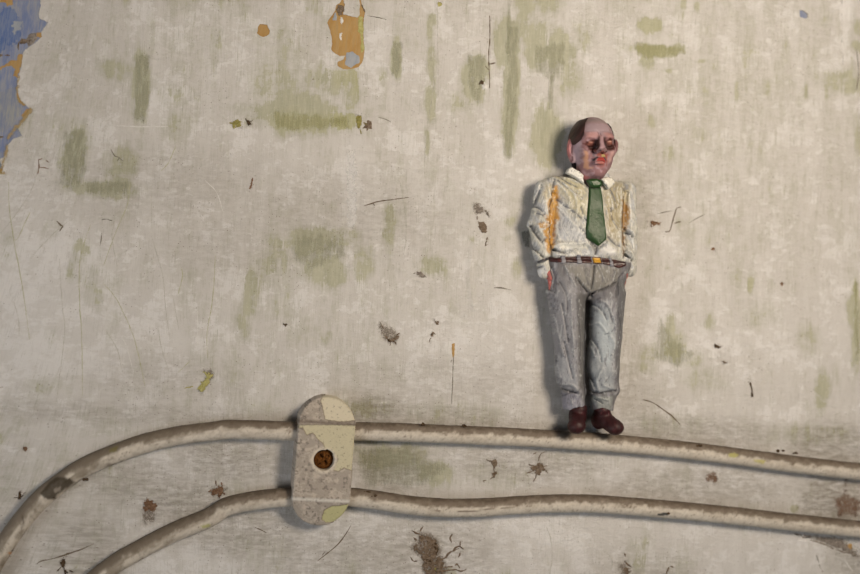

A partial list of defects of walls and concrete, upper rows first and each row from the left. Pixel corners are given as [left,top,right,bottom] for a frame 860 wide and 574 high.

peeling [0,0,48,175]
peeling [327,0,387,69]